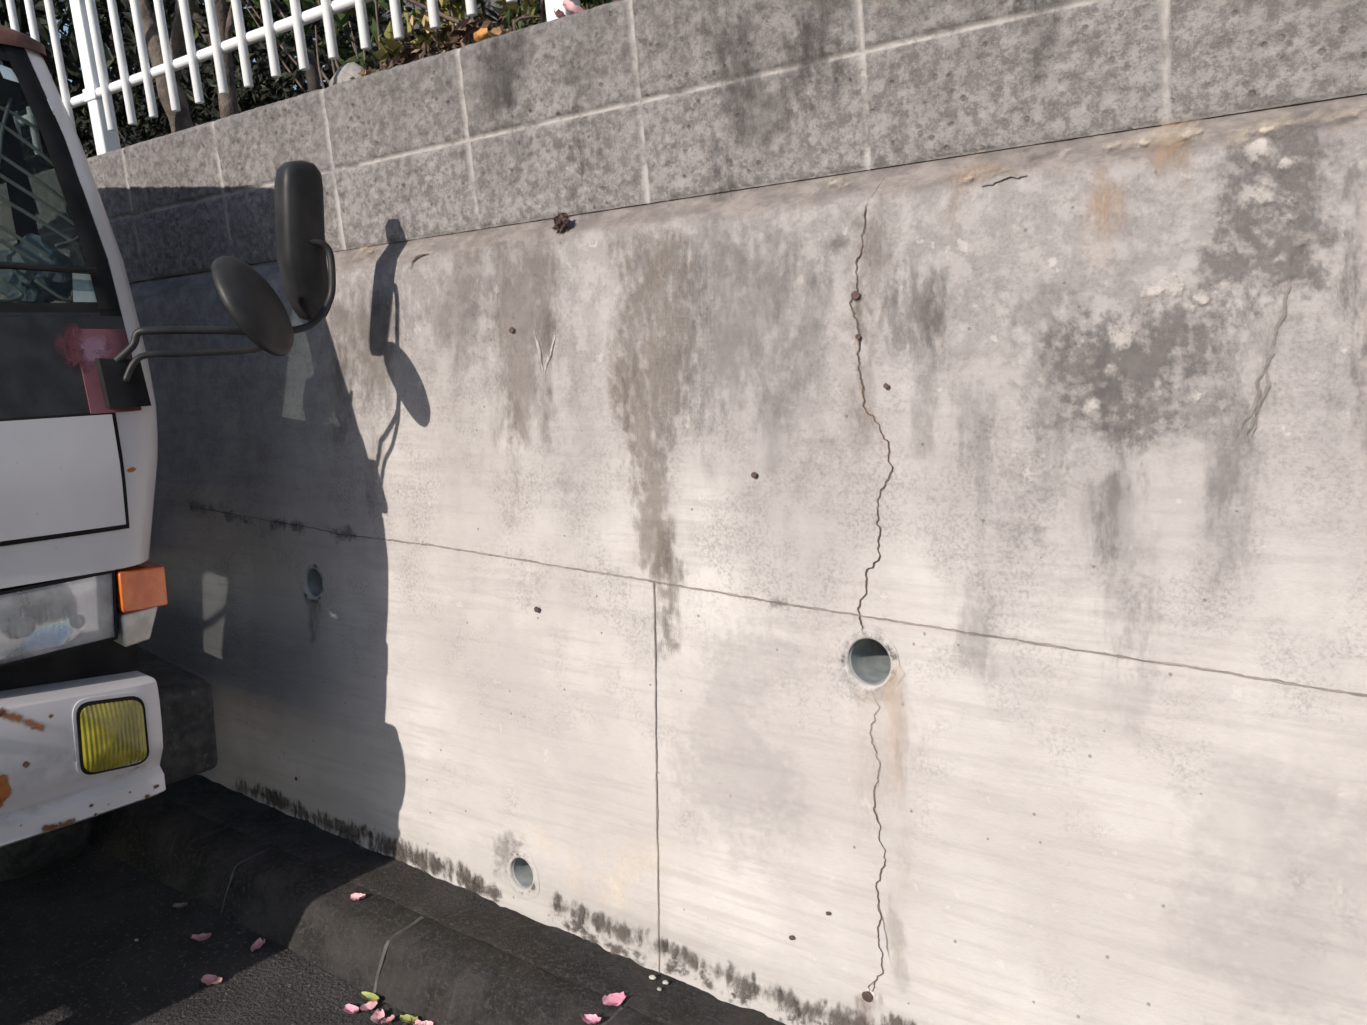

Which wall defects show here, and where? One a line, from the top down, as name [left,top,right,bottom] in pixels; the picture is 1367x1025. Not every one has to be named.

crack [849,176,893,630]
leakage [1040,114,1334,442]
crack [1241,239,1307,442]
crack [868,697,891,993]